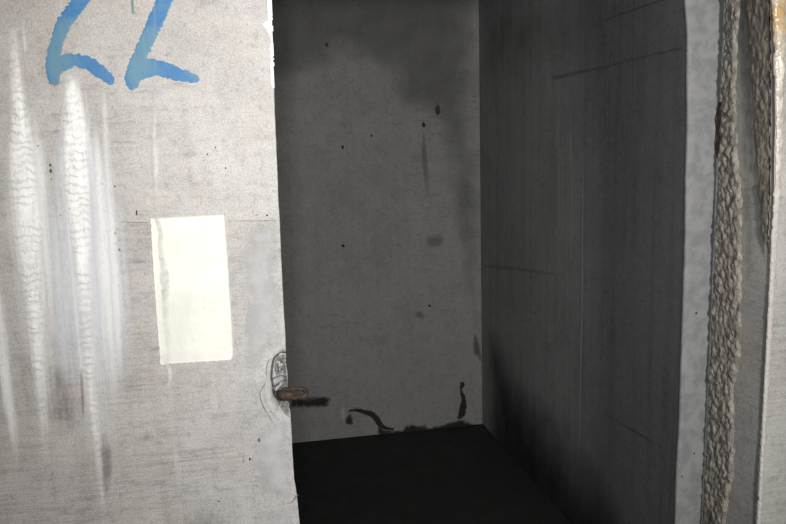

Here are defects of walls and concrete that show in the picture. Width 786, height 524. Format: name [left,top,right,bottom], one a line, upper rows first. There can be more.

damp [0,299,14,435]
damp [10,29,52,393]
damp [59,78,121,433]
spalling [702,0,771,524]